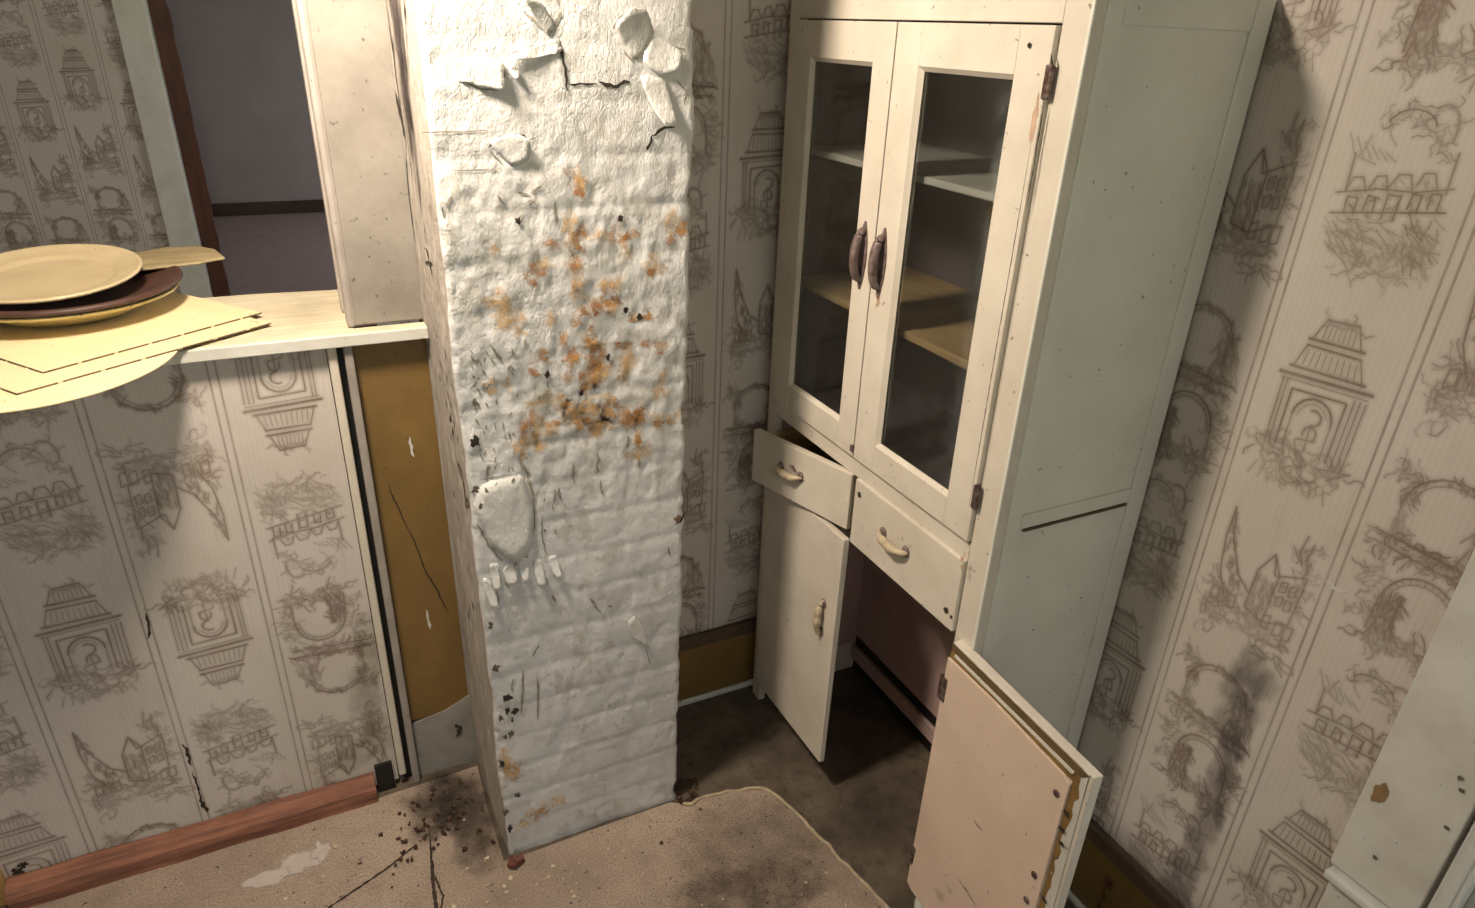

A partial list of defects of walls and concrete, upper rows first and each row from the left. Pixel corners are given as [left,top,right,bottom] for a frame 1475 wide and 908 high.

crack [560,41,630,91]
leakage [386,0,421,202]
crack [646,126,675,150]
rust [566,171,586,198]
rust [513,216,675,459]